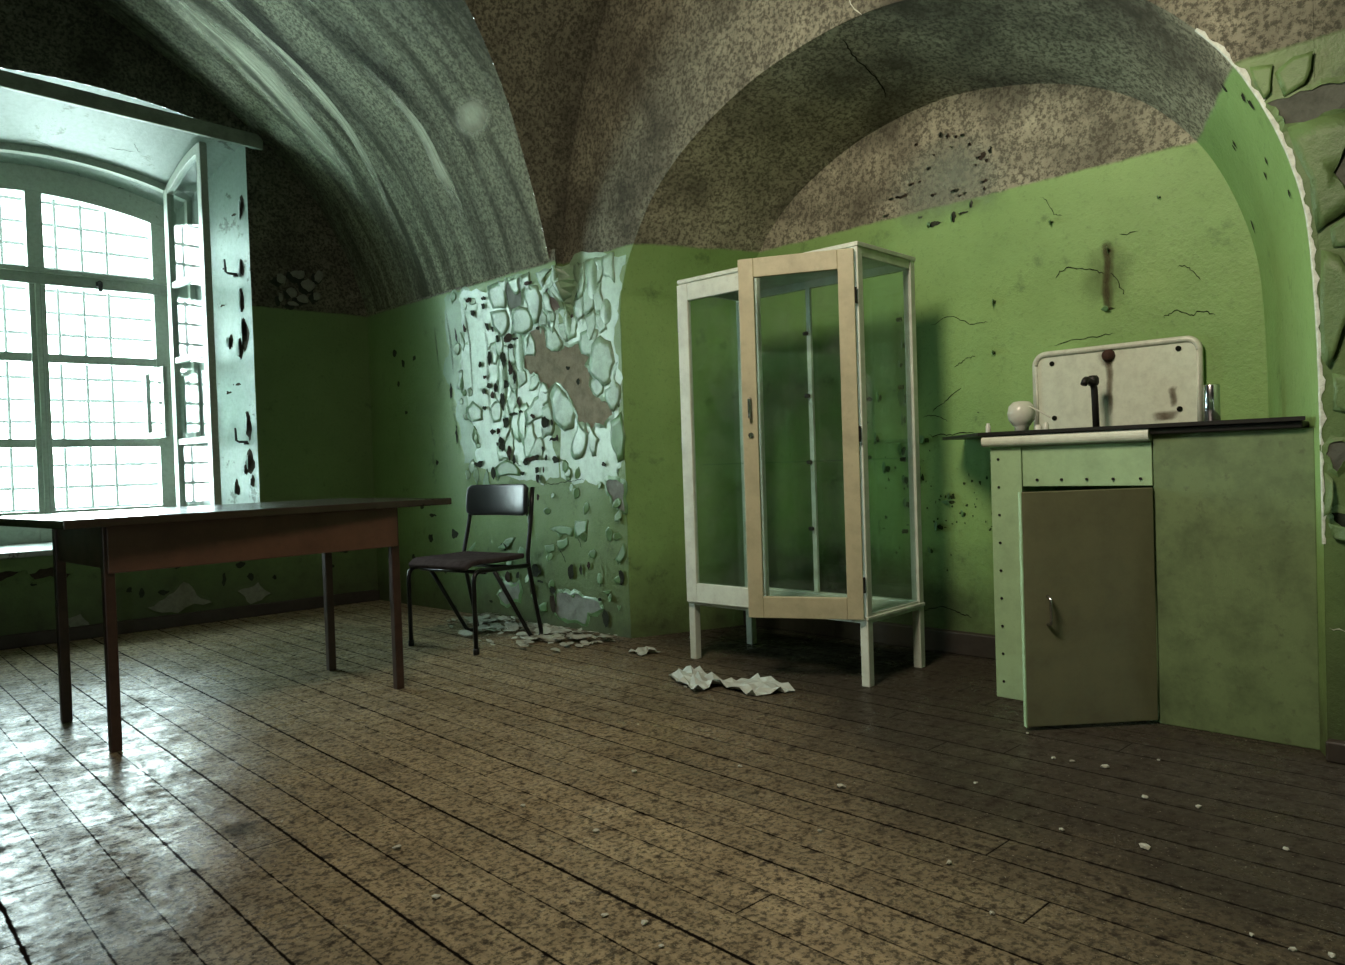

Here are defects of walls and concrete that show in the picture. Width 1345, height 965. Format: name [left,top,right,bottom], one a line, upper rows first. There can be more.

peeling [230,195,244,220]
peeling [220,259,250,359]
peeling [1195,28,1345,544]
peeling [233,411,255,495]
peeling [443,251,628,628]